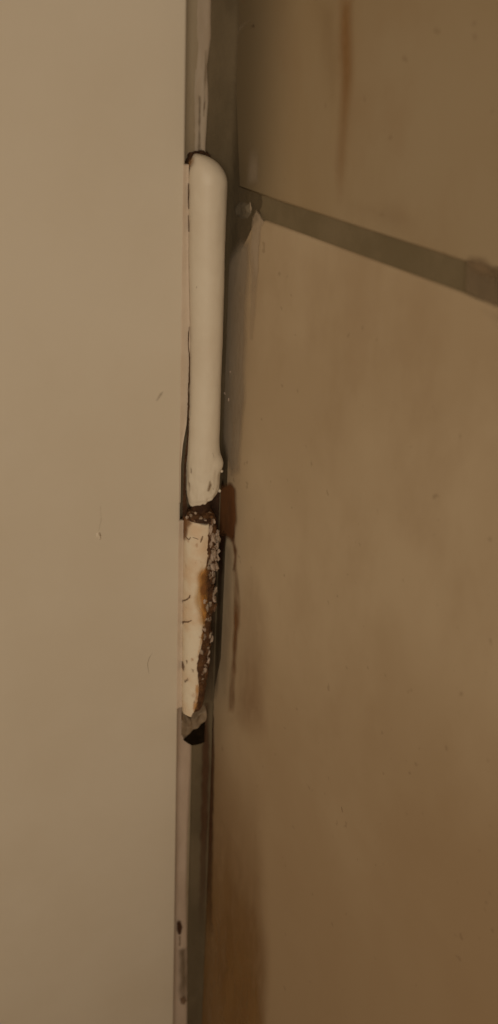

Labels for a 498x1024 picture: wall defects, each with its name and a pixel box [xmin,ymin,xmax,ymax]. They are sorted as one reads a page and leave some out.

peeling [185,512,221,695]
corrosion [183,482,236,620]